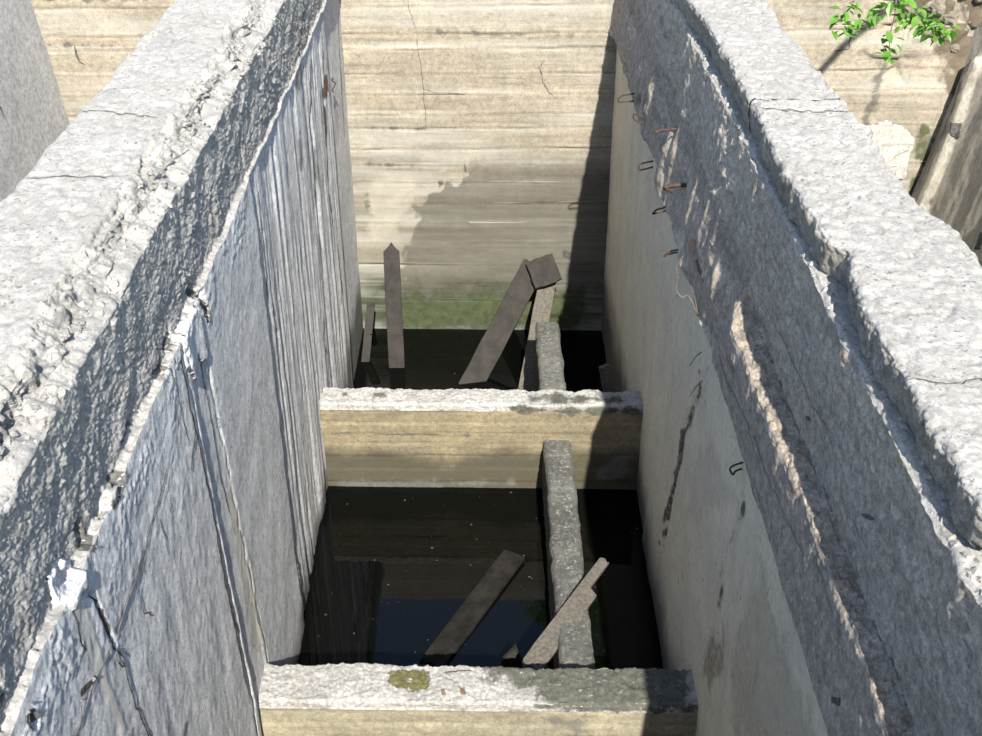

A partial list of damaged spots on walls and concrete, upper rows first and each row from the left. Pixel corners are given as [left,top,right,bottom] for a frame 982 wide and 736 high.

crack [408,5,466,128]
spalling [0,0,267,460]
crack [907,376,982,384]
spalling [73,516,98,552]
spalling [107,469,127,510]
crack [139,469,169,616]
crack [153,333,264,701]
peeling [46,558,125,735]